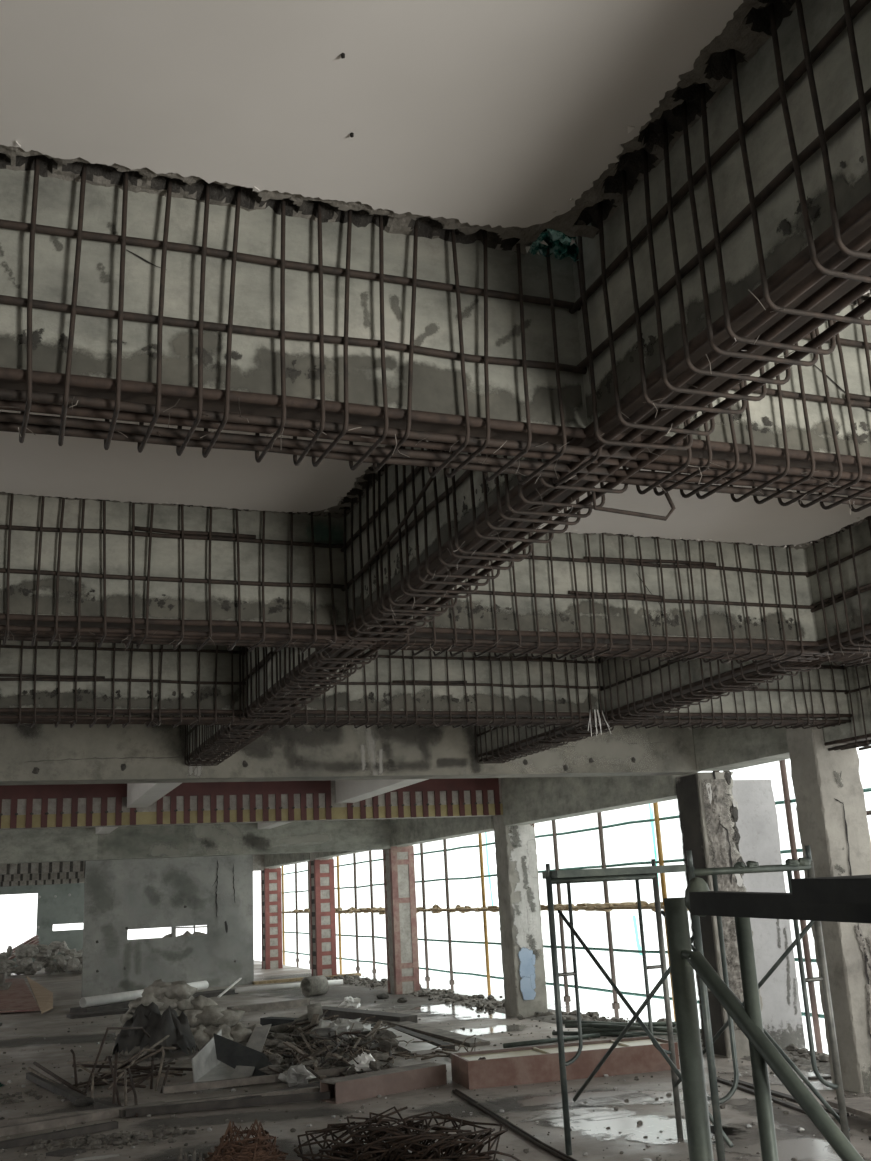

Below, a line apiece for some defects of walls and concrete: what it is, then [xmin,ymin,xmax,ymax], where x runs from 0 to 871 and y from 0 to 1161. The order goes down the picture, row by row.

peeling [0,328,583,426]
peeling [665,405,871,457]
spalling [0,463,393,519]
spalling [567,516,871,550]
peeling [0,577,338,624]
peeling [401,599,805,640]
peeling [0,687,239,709]
peeling [288,689,598,712]
spalling [702,771,745,892]
spalling [718,916,744,1002]